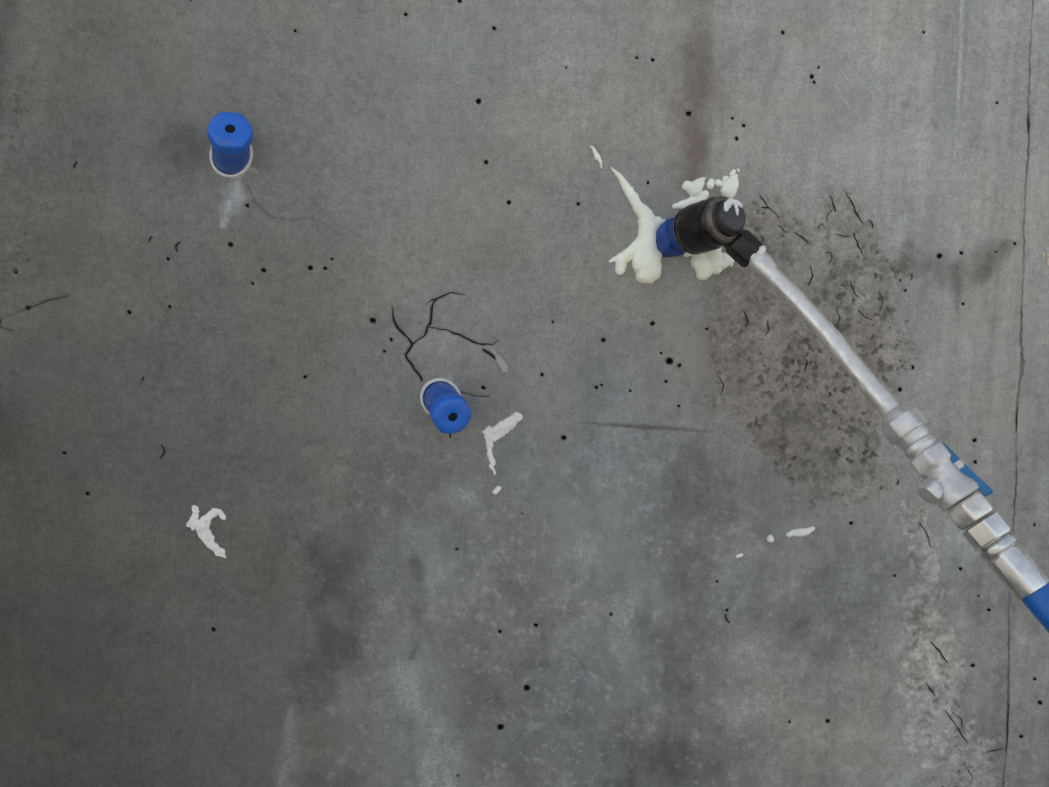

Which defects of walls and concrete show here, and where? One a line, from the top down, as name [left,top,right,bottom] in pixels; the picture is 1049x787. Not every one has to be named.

crack [392,292,508,397]
spalling [743,186,917,397]
spalling [700,247,1012,787]
crack [1004,642,1012,752]